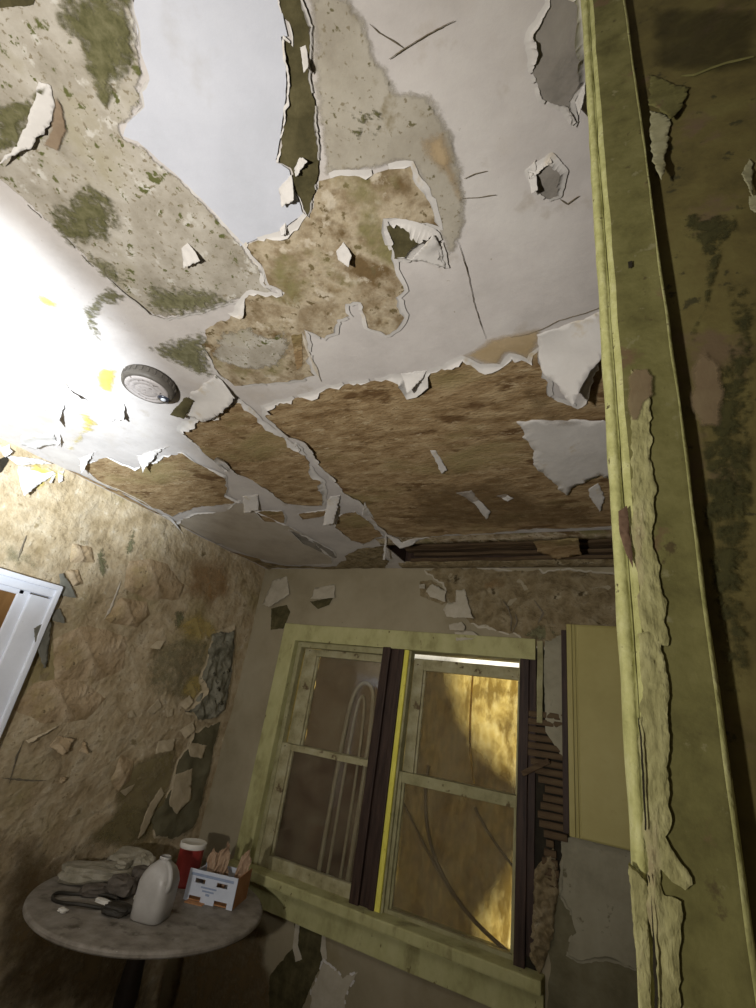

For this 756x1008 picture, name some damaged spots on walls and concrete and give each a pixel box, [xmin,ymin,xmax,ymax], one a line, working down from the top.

damp [56,0,134,106]
crack [370,21,453,59]
damp [0,90,43,149]
damp [52,186,125,336]
damp [147,286,226,316]
peeling [0,0,612,567]
crack [458,243,486,338]
damp [148,334,217,378]
peeling [34,608,65,668]
peeling [262,576,290,630]
peeling [138,624,236,841]
peeling [419,369,693,1008]